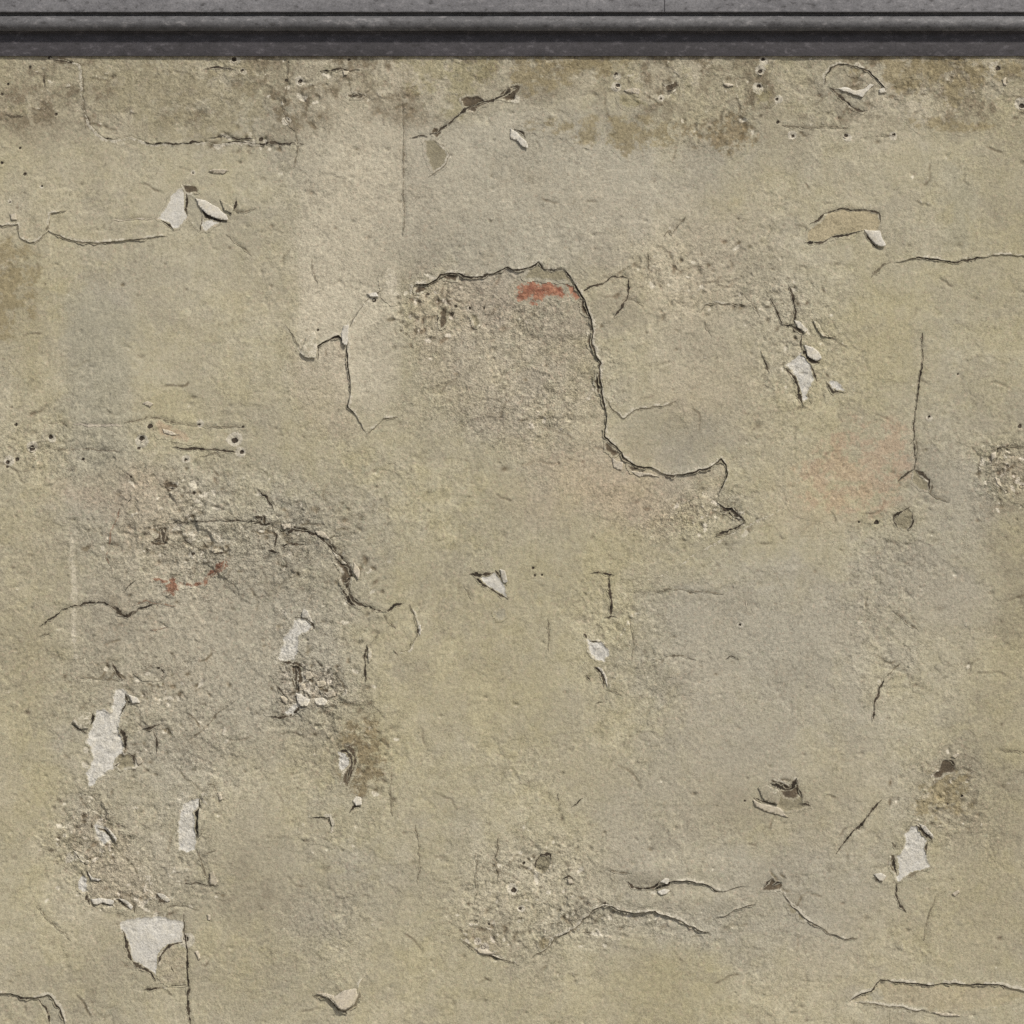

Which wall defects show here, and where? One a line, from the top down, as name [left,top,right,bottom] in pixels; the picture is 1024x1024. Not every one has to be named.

crack [430,83,523,139]
peeling [0,172,256,256]
crack [871,262,890,278]
peeling [770,284,846,406]
crack [898,332,948,502]
crack [40,580,175,636]
crack [253,488,404,628]
peeling [270,609,350,721]
peeling [71,662,168,788]
peeling [63,803,211,1024]
crack [836,800,882,854]
peeling [873,823,933,913]